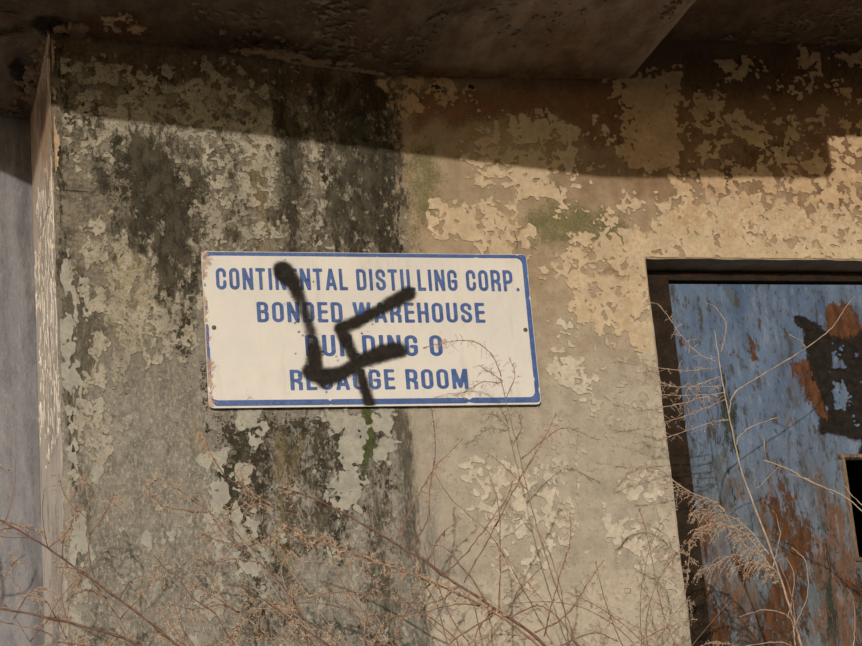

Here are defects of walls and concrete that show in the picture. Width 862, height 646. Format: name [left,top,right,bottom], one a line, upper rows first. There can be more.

spalling [101,12,147,36]
leakage [217,63,630,253]
leakage [0,17,427,646]
peeling [13,21,481,489]
peeling [425,44,862,646]
corrosion [746,333,759,361]
corrosion [790,359,828,420]
corrosion [824,298,862,339]
peeling [42,498,96,646]
peeling [317,407,402,607]
corrosion [730,550,757,584]
corrosion [749,459,821,646]